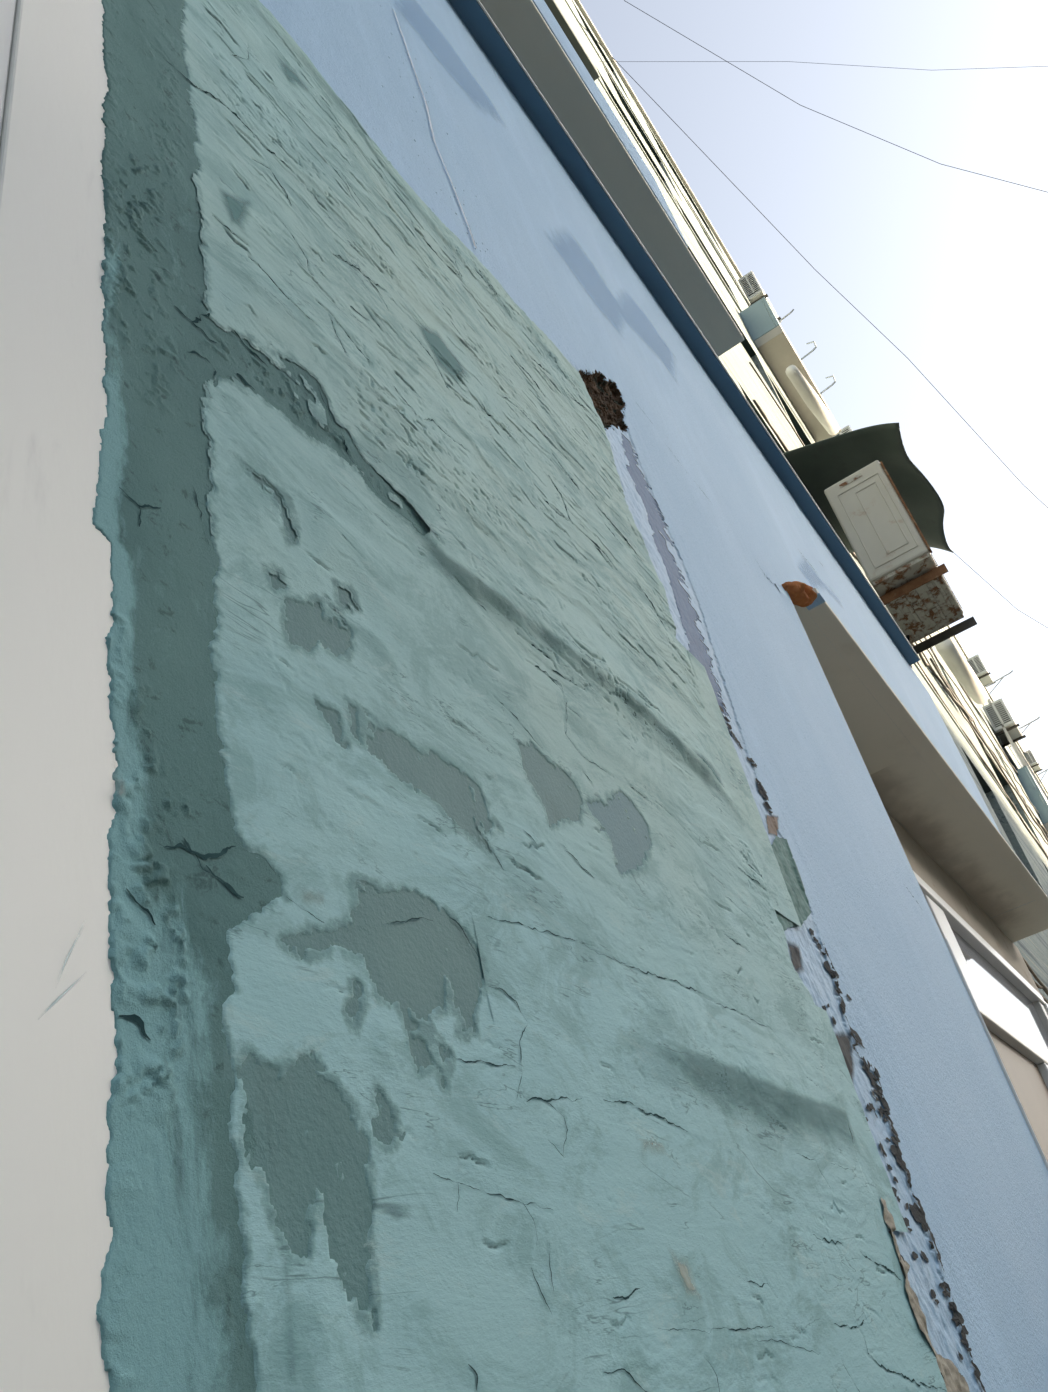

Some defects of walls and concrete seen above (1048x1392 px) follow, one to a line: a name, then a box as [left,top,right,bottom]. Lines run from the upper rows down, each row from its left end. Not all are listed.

crack [484,355,663,624]
spalling [578,369,628,432]
peeling [92,0,428,1392]
peeling [719,703,773,814]
crack [119,1014,151,1040]
crack [160,838,324,923]
peeling [280,884,484,1089]
crack [392,916,766,1156]
flaking render [771,836,839,978]
crack [813,948,986,1392]
spalling [862,1066,972,1392]
crack [663,1276,944,1392]